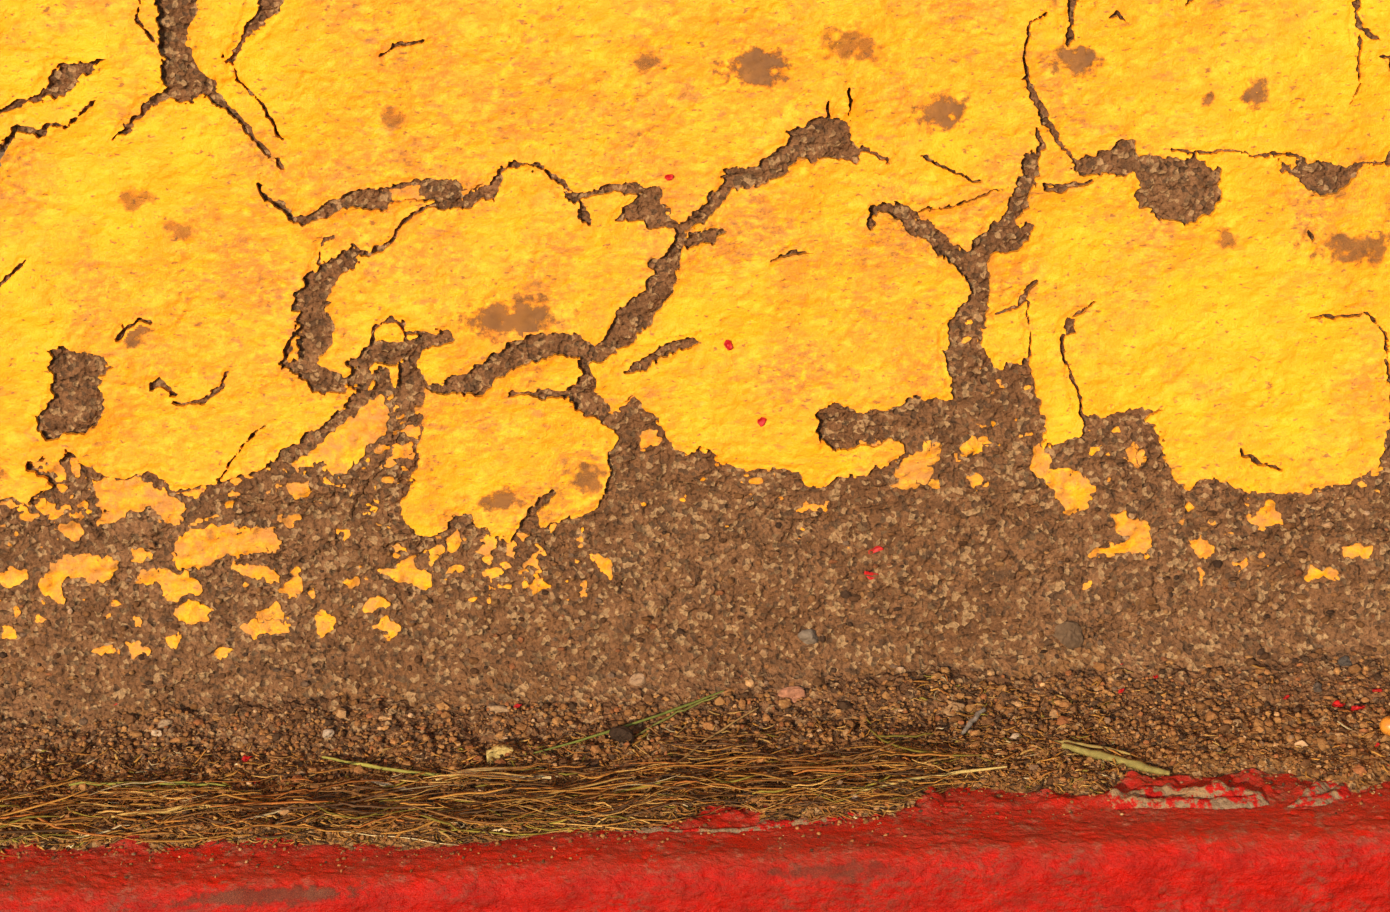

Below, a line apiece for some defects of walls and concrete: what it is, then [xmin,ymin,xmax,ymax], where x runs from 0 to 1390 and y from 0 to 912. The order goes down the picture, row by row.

crack [379,39,425,56]
crack [1351,0,1390,93]
crack [227,56,284,139]
crack [866,0,1094,416]
peeling [1072,139,1253,225]
crack [0,259,26,287]
crack [219,87,889,478]
crack [116,317,153,341]
crack [150,371,230,405]
crack [1314,311,1390,400]
crack [526,489,556,517]
peeling [0,311,1390,734]